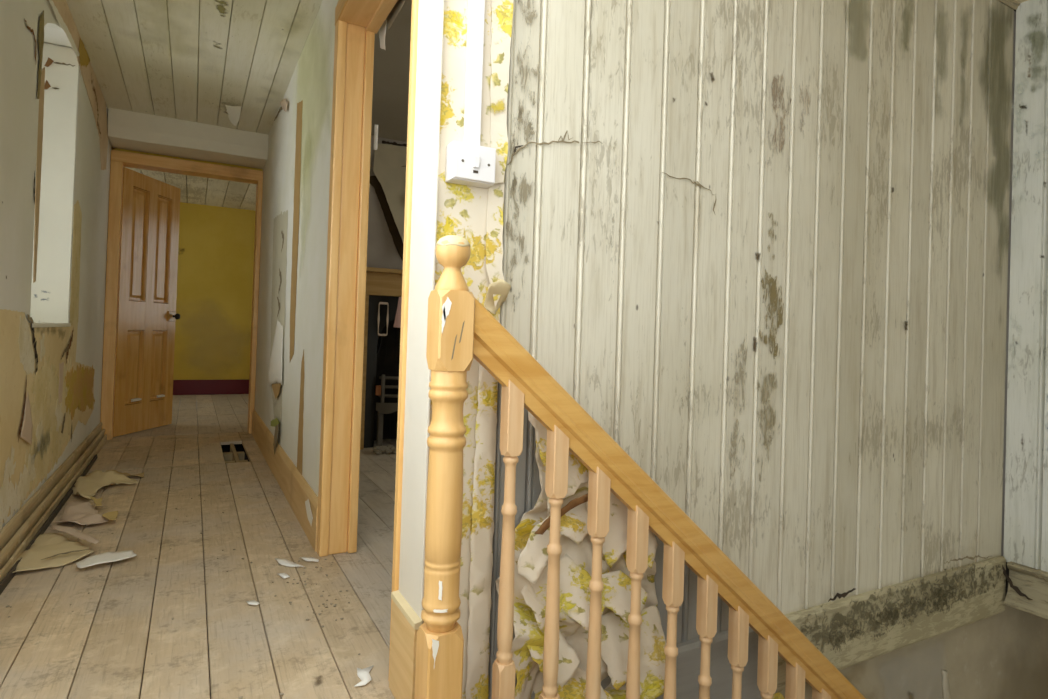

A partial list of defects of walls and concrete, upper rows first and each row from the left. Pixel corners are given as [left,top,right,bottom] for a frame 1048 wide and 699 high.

crack [507,131,603,165]
crack [662,172,716,213]
flaking render [0,200,95,531]
damp [801,564,1008,653]